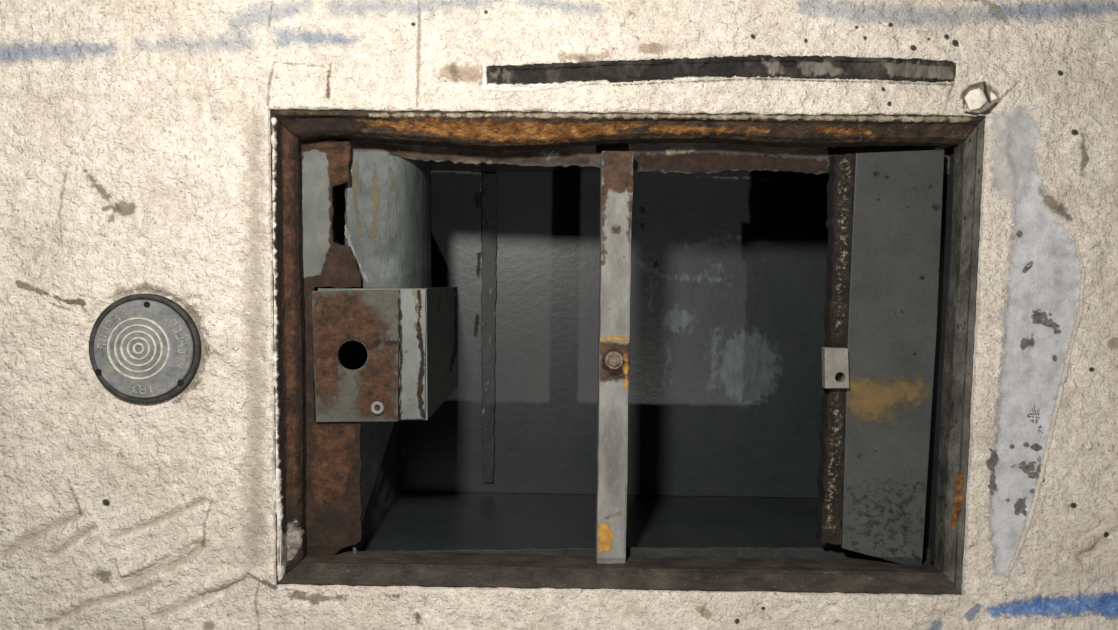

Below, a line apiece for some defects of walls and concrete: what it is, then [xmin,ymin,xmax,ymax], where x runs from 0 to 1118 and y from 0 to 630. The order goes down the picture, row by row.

spalling [481,63,609,91]
rust [816,126,872,137]
rust [274,113,828,553]
spalling [269,82,1000,595]
rust [951,473,964,530]